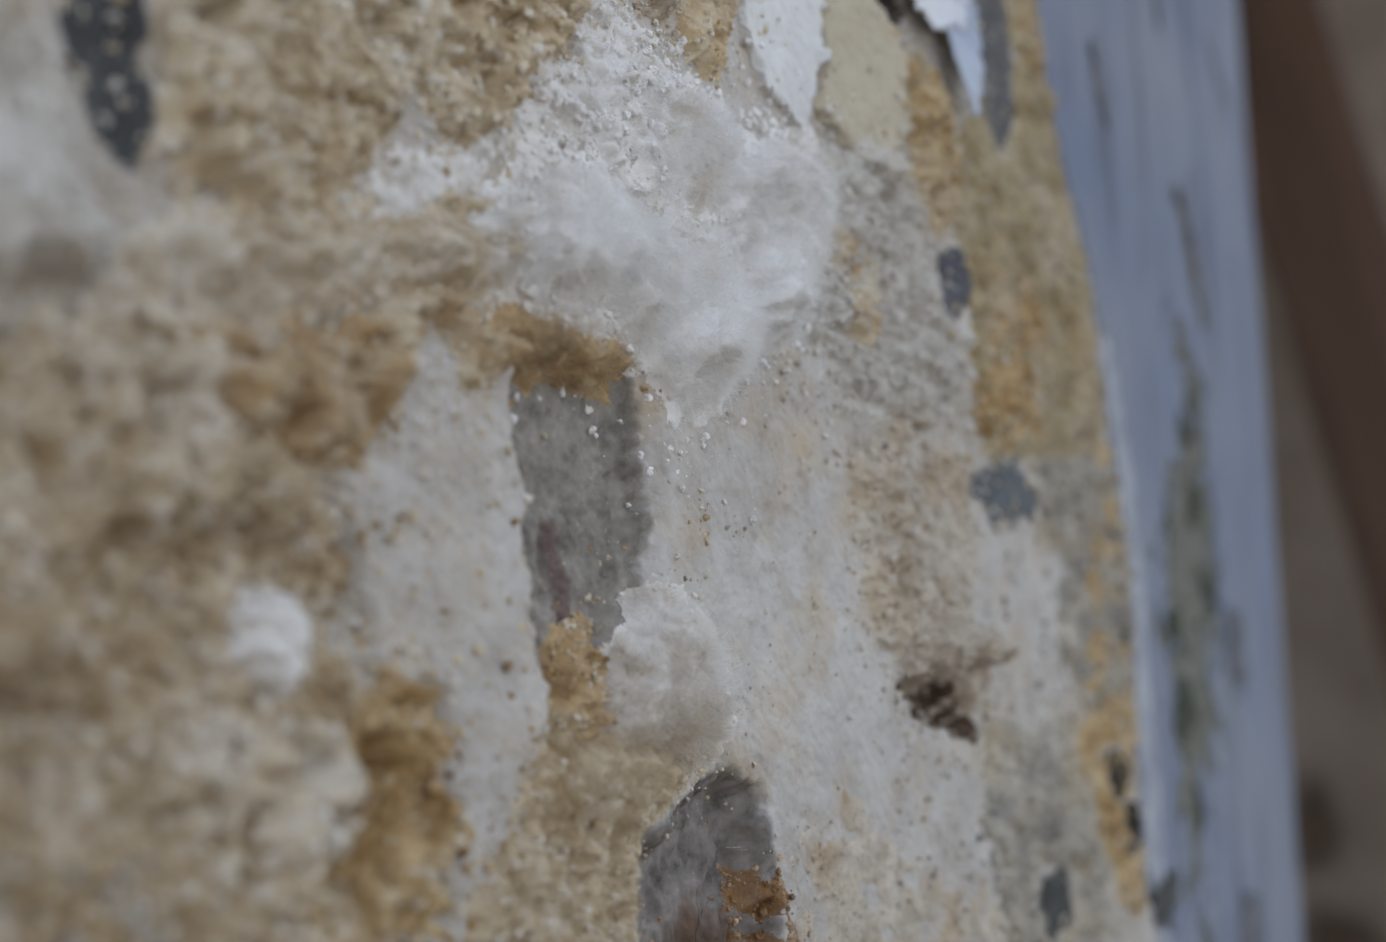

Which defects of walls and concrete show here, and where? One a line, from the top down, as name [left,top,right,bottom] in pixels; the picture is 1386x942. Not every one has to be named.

peeling [914,0,985,120]
hole [895,680,979,745]
spalling [636,769,782,942]